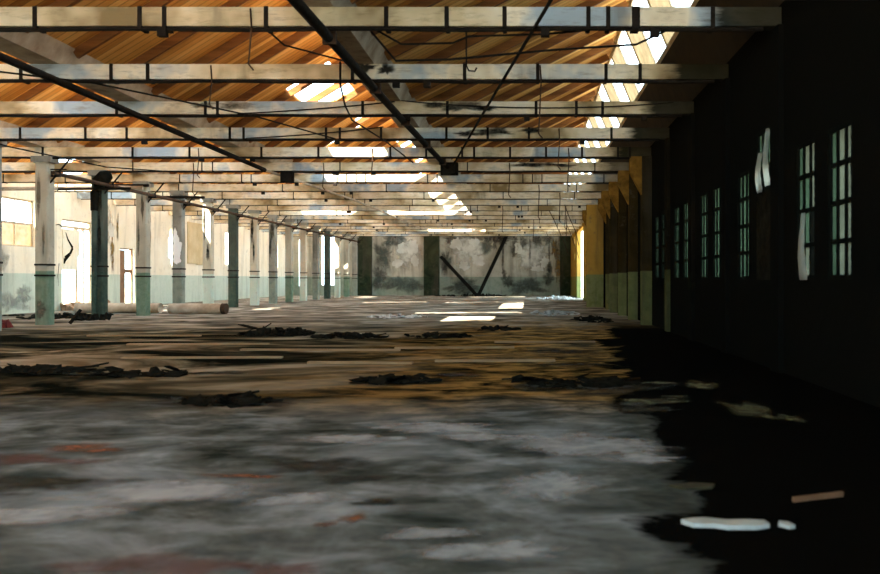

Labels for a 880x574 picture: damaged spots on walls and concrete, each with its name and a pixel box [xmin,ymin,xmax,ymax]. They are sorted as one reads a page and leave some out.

spalling [170,228,182,267]
leakage [373,236,423,292]
leakage [442,236,554,294]